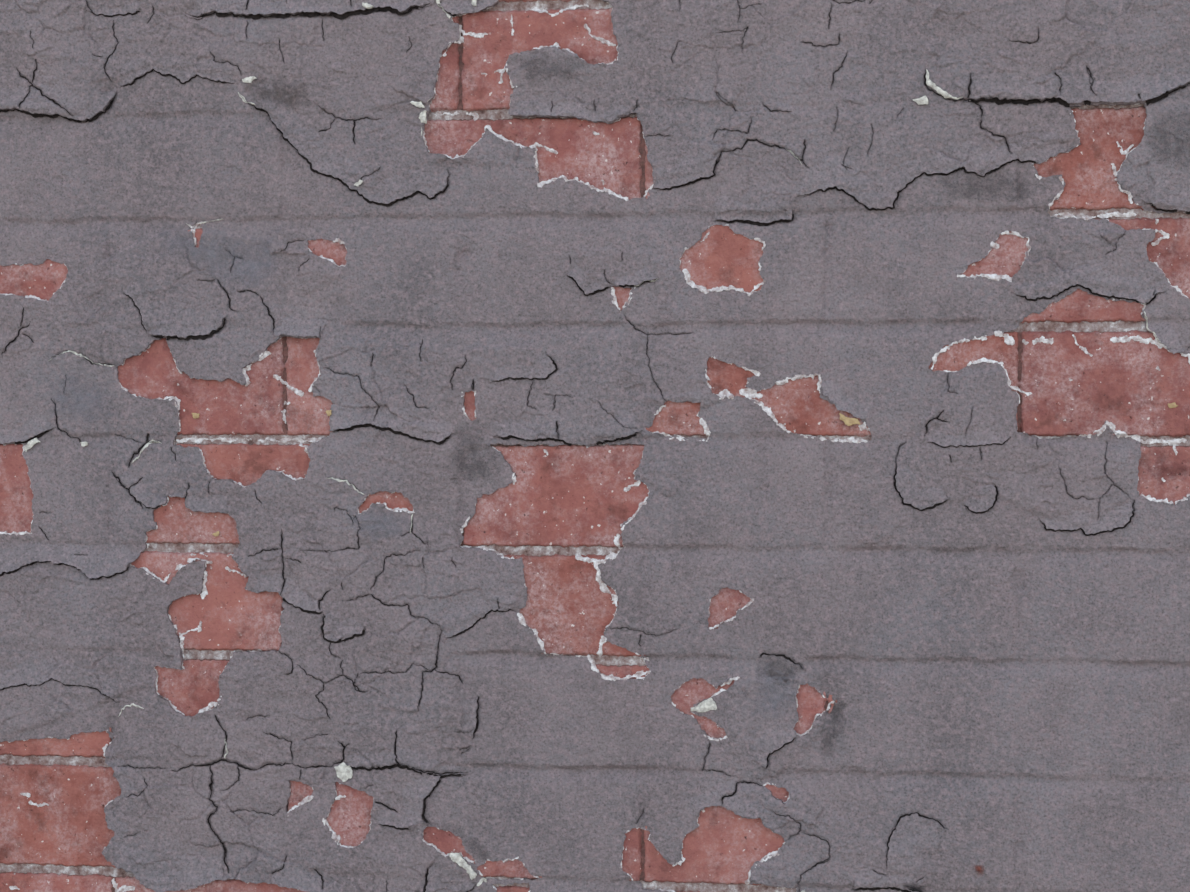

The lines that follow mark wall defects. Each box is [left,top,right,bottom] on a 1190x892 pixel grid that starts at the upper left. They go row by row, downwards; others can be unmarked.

crack [17,31,71,115]
peeling [0,0,718,207]
crack [713,94,806,166]
crack [924,72,1062,152]
crack [198,250,274,333]
peeling [786,67,1190,536]
crack [112,433,210,507]
peeling [0,302,456,716]
peeling [438,400,711,681]
peeling [0,727,341,892]
crack [119,477,470,873]
peeling [621,653,837,892]